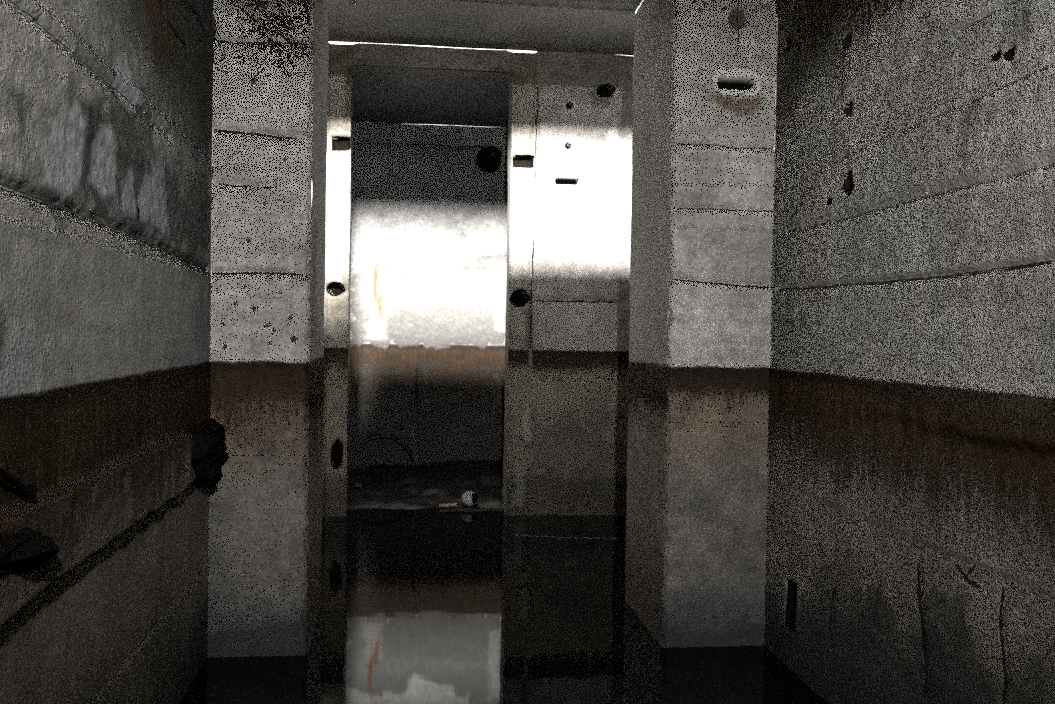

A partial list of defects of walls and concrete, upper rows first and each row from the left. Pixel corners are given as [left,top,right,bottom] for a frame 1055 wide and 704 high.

crack [9,0,171,146]
water stain [40,55,210,268]
crack [0,182,304,277]
crack [675,260,1055,296]
water stain [0,344,1055,543]